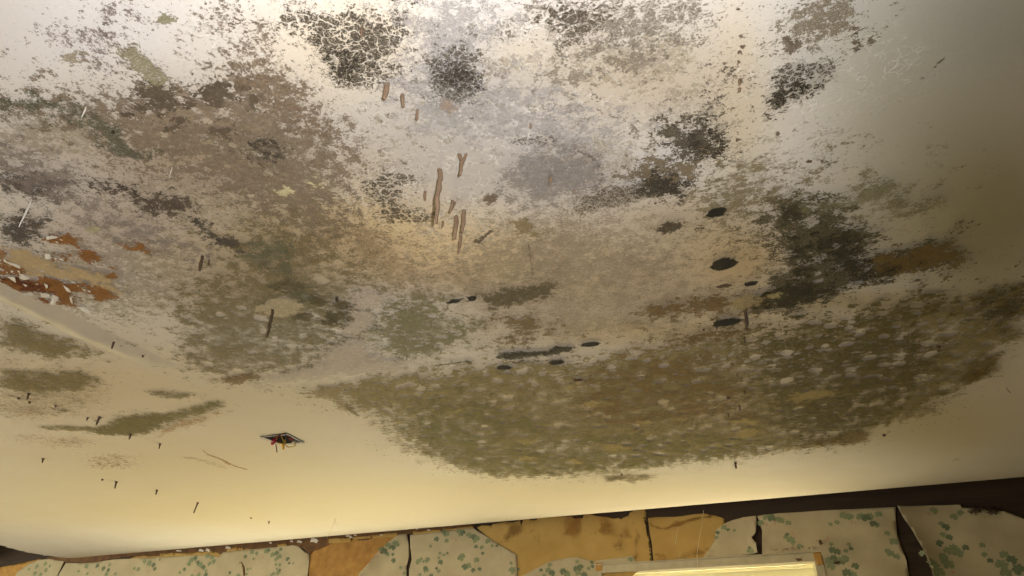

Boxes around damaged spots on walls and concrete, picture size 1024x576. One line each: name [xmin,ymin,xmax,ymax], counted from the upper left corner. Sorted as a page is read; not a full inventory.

damp [650,219,690,235]
peeling [1,245,130,297]
damp [710,257,741,271]
damp [0,309,239,450]